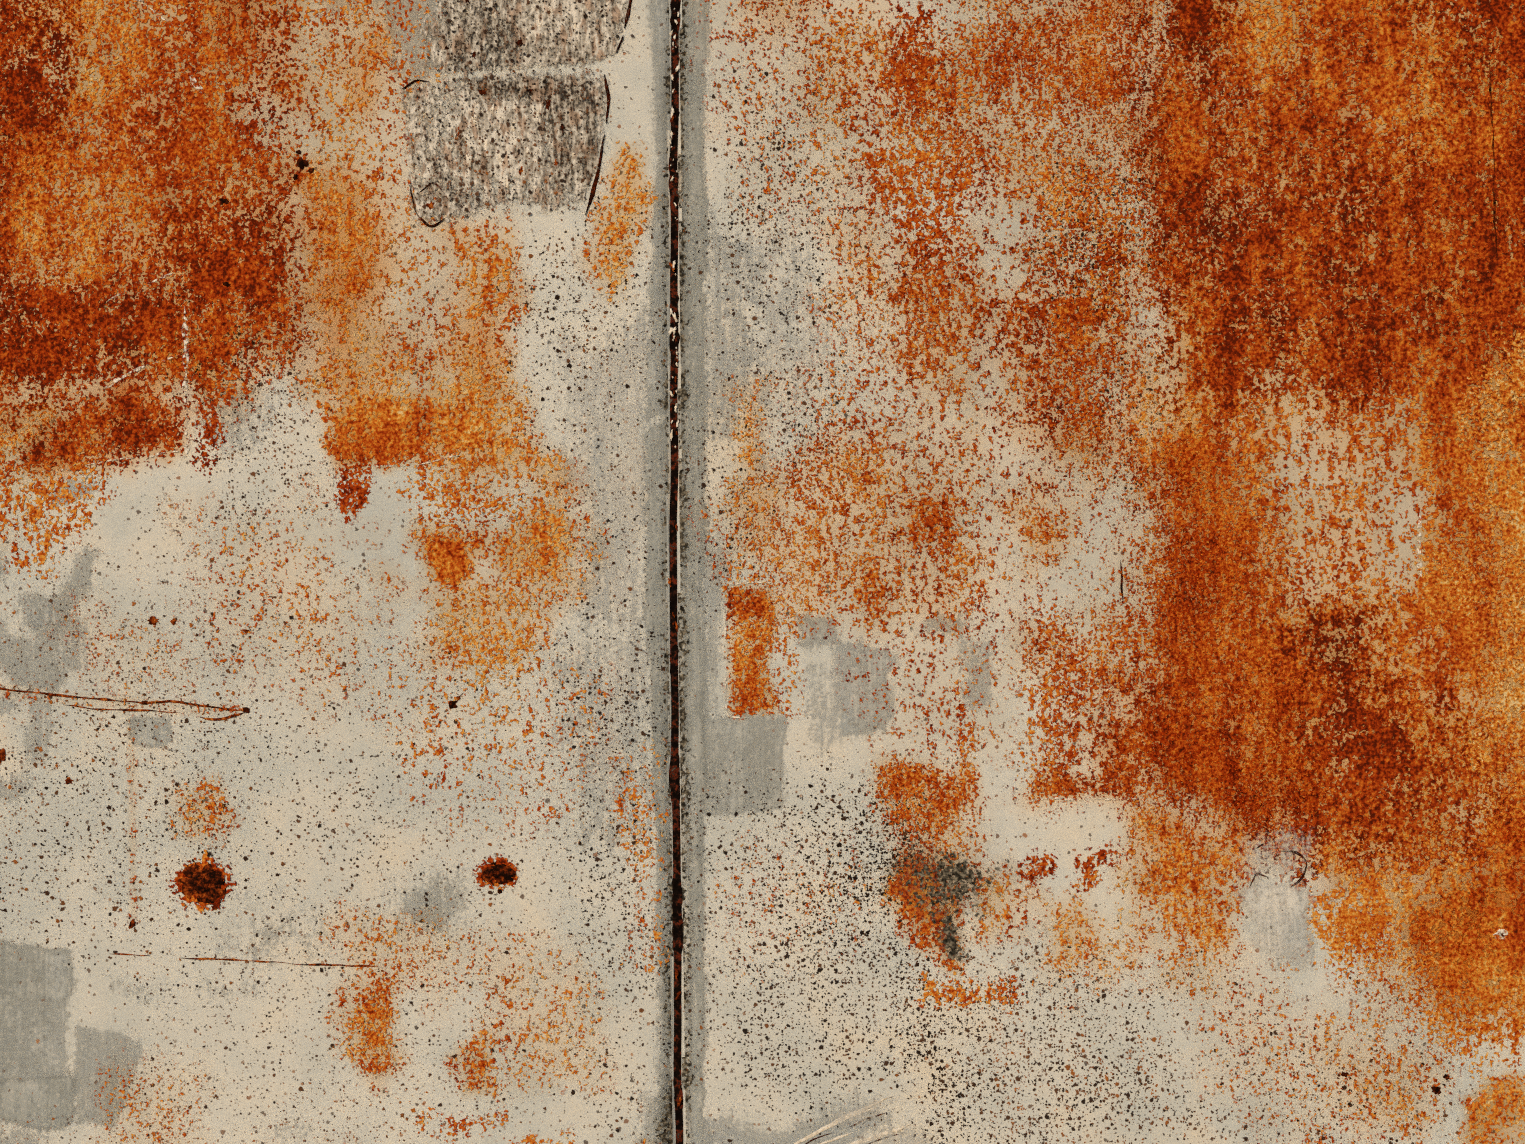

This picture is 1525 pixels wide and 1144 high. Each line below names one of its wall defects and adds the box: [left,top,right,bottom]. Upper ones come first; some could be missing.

corrosion [94,1050,216,1144]
corrosion [0,0,680,1000]
corrosion [318,900,614,1144]
corrosion [675,0,1525,1144]